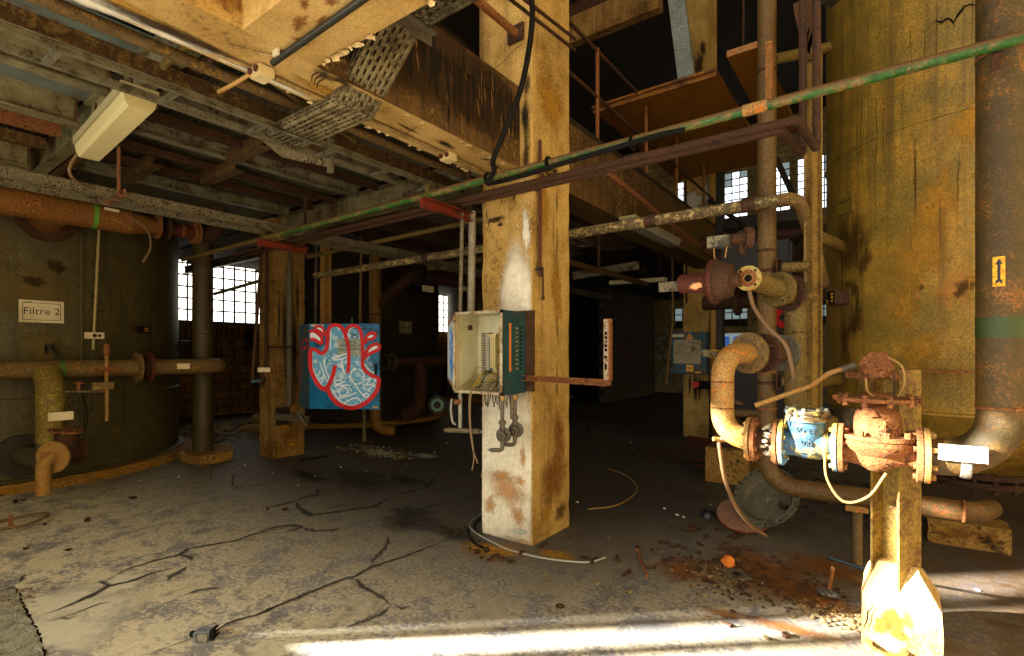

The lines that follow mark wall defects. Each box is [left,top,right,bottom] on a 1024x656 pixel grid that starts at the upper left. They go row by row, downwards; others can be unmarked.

crack [928,3,975,28]
water stain [502,183,531,311]
corrosion [487,472,525,522]
water stain [482,393,531,543]
corrosion [542,417,565,521]
crack [48,486,474,626]
corrosion [665,551,864,613]
corrosion [709,608,738,619]
corrosion [752,617,825,639]